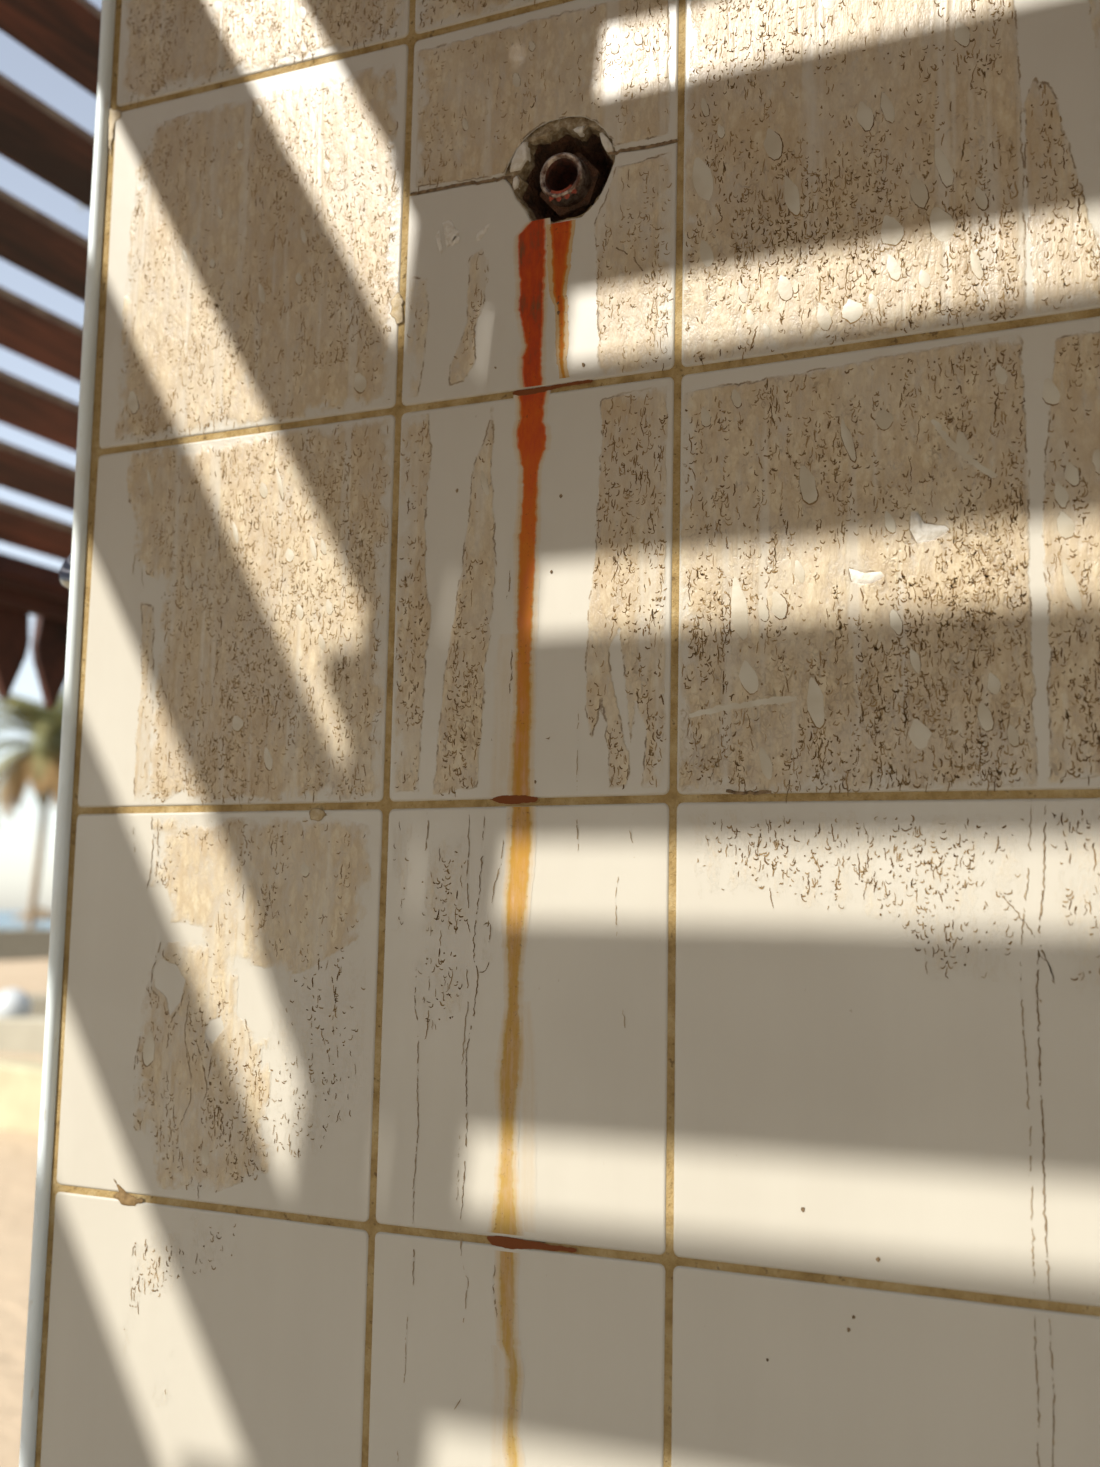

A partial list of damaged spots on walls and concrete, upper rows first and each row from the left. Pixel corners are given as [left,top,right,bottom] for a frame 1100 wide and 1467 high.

crack [124,1224,236,1330]
leakage [166,992,207,1123]
rust [487,218,593,1467]
crack [118,0,1100,1192]